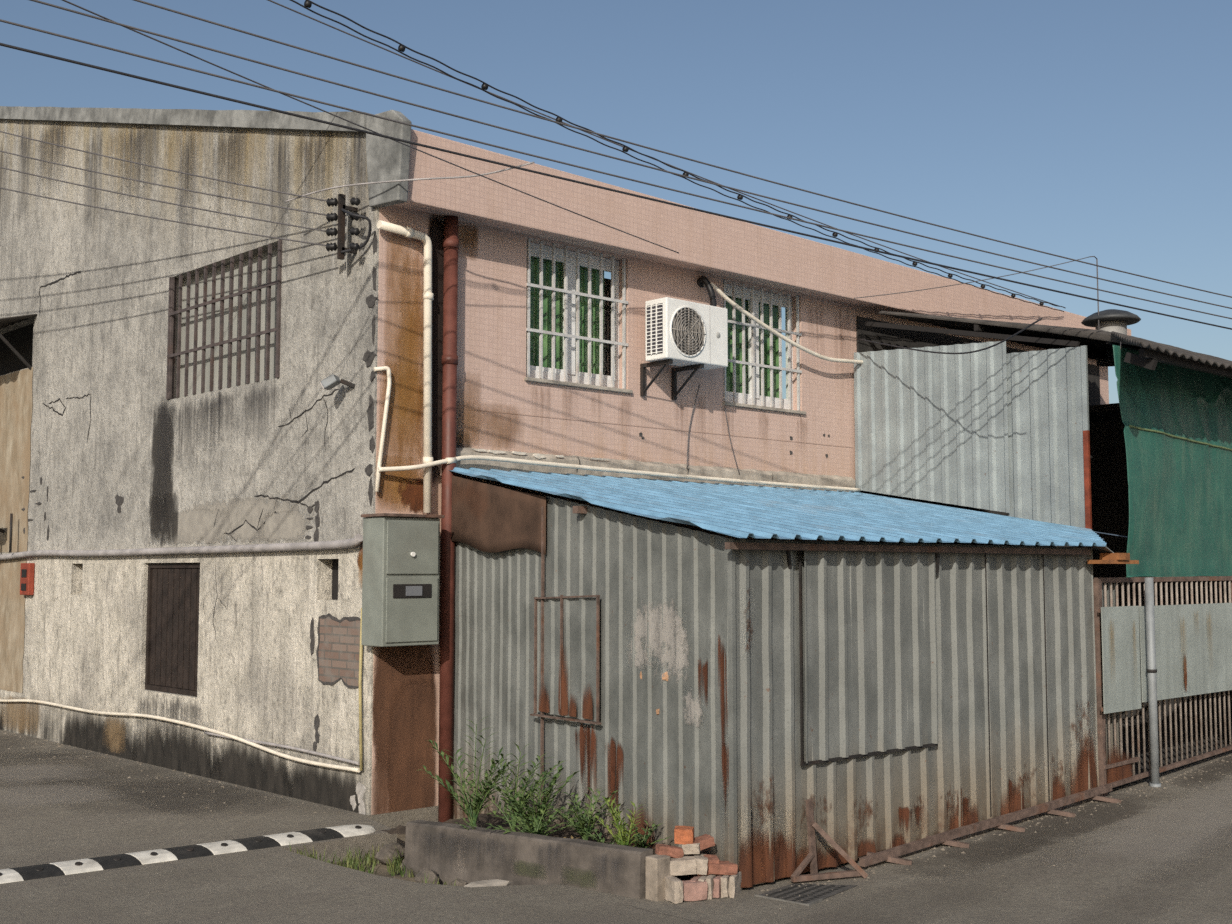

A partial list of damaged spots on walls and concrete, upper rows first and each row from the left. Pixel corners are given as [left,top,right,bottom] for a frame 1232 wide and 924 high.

damp [150,407,190,542]
crack [201,389,354,542]
flaking render [310,613,361,688]
damp [0,702,37,730]
damp [61,718,360,813]
rust [539,659,623,812]
rust [739,799,921,888]
rust [945,789,978,830]